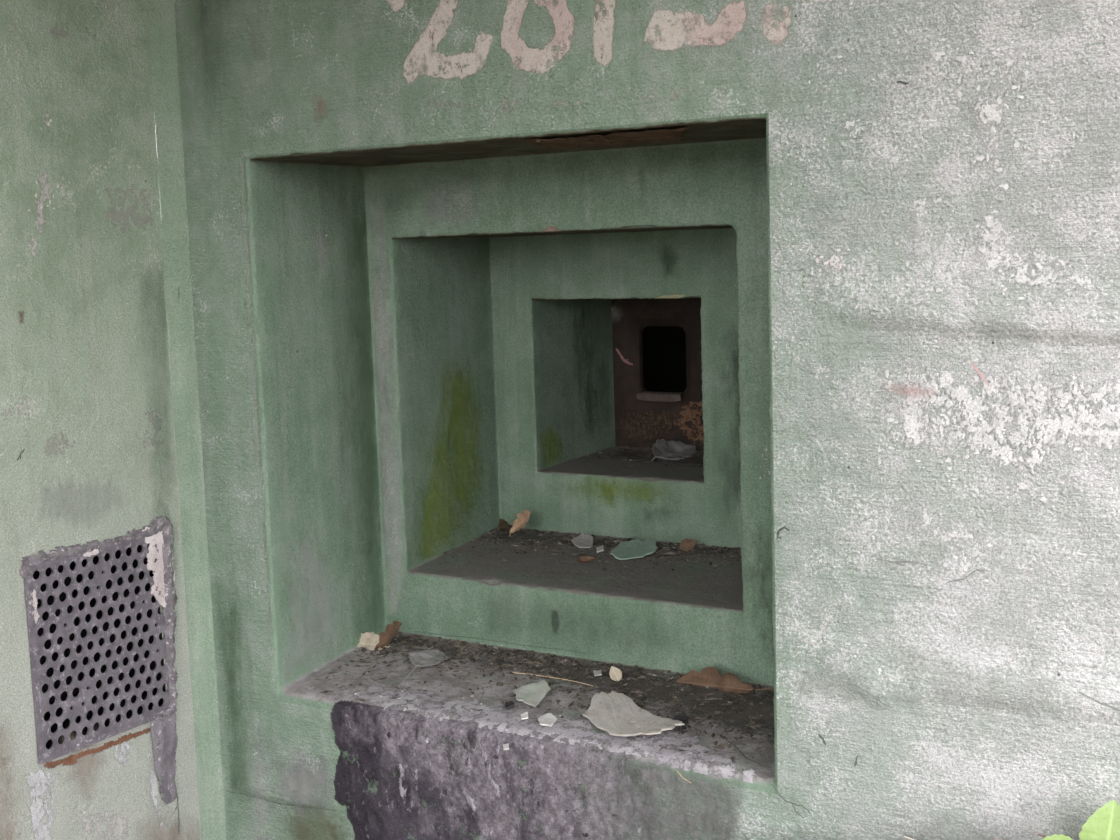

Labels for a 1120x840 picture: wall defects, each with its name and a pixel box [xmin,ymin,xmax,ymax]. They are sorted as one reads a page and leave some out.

peeling [878,356,1120,518]
rust [44,728,150,768]